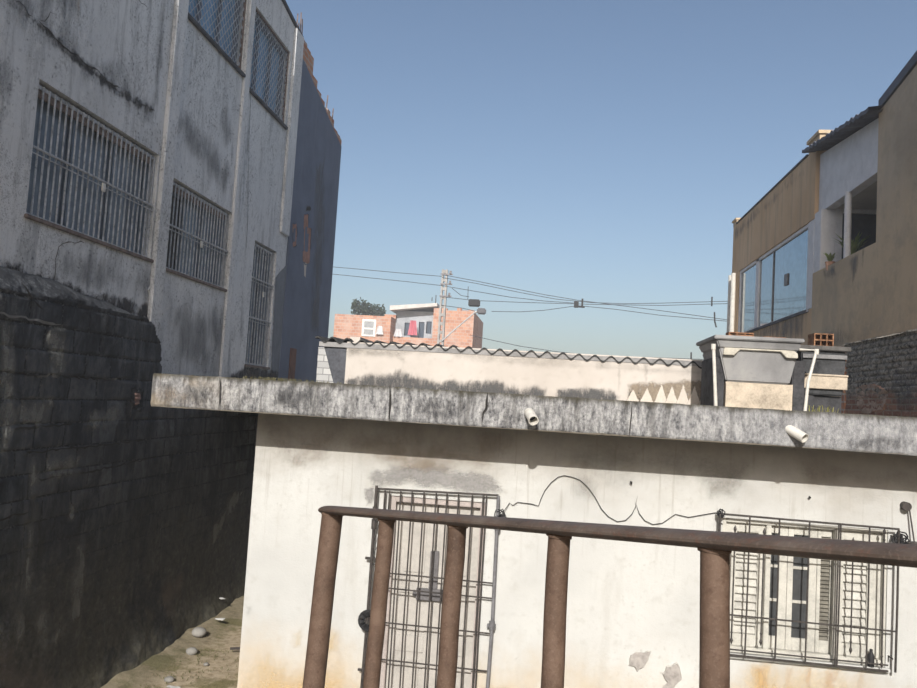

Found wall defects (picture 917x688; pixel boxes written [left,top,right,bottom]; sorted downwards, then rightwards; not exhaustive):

crack [15,0,155,111]
peeling [629,651,651,671]
peeling [662,662,682,688]